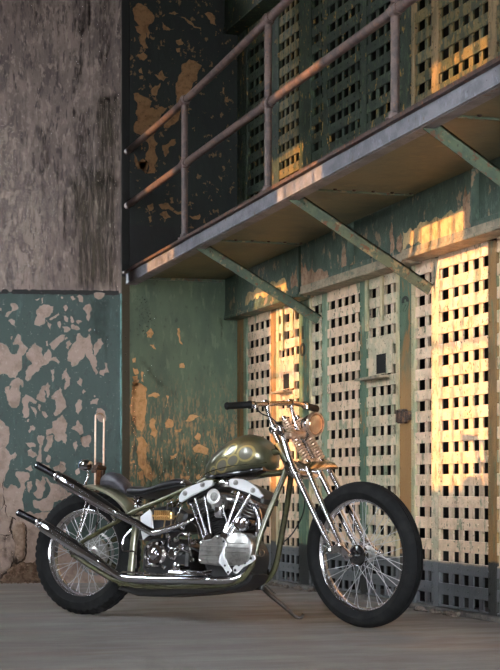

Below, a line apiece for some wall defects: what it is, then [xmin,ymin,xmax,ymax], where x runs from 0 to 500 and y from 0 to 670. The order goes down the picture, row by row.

peeling [132,3,155,61]
peeling [175,59,202,103]
peeling [133,70,181,174]
peeling [147,197,181,222]
peeling [389,185,471,254]
peeling [245,288,269,306]
peeling [270,263,329,291]
peeling [0,292,109,584]
peeling [130,358,169,482]
peeling [165,414,199,433]
peeling [192,432,209,455]